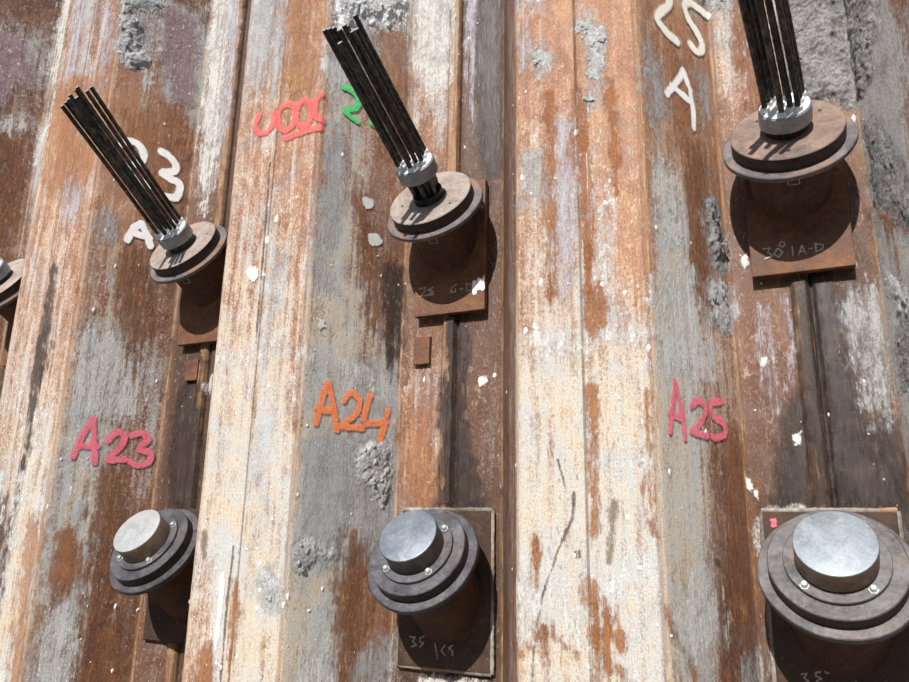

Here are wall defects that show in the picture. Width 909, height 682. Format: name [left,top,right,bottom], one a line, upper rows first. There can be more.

rust [41,65,107,202]
rust [116,101,191,206]
water stain [472,0,502,204]
water stain [327,263,408,398]
rust [10,465,133,682]
rust [329,526,375,682]
rust [584,383,601,538]
rust [639,389,652,457]
rust [640,470,659,537]
rust [685,651,697,682]
rust [712,426,762,682]
water stain [769,273,909,546]